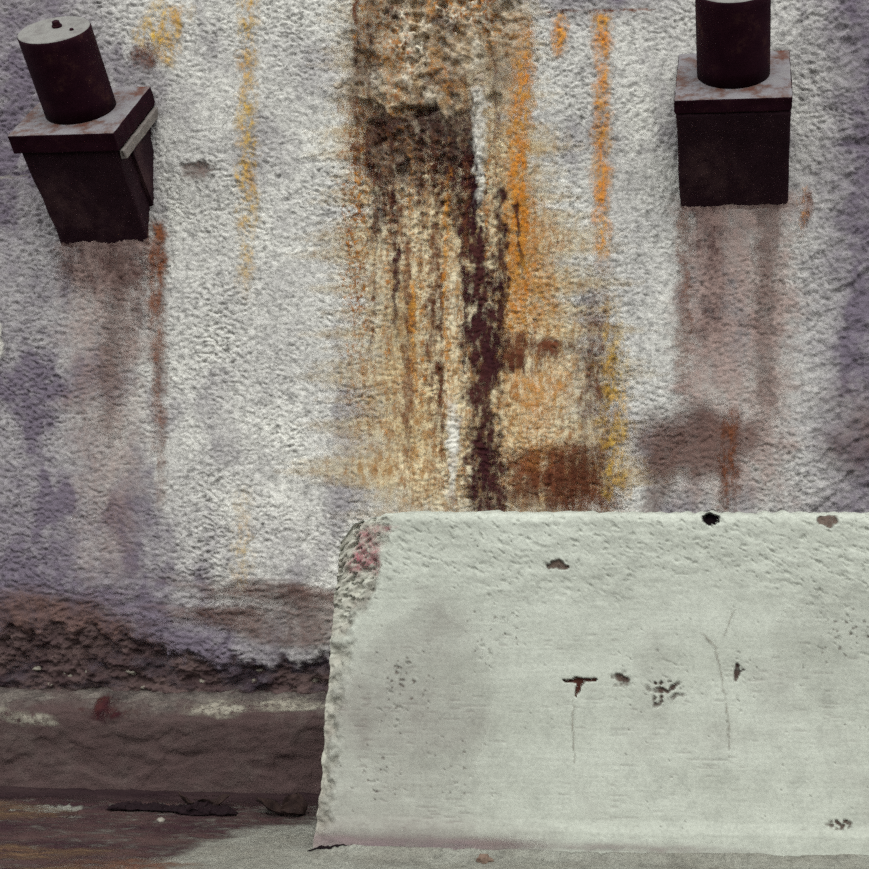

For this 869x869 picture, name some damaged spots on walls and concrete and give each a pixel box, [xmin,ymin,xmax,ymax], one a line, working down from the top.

corrosion [333,0,627,512]
water stain [0,591,129,659]
water stain [196,608,269,638]
water stain [227,582,334,645]